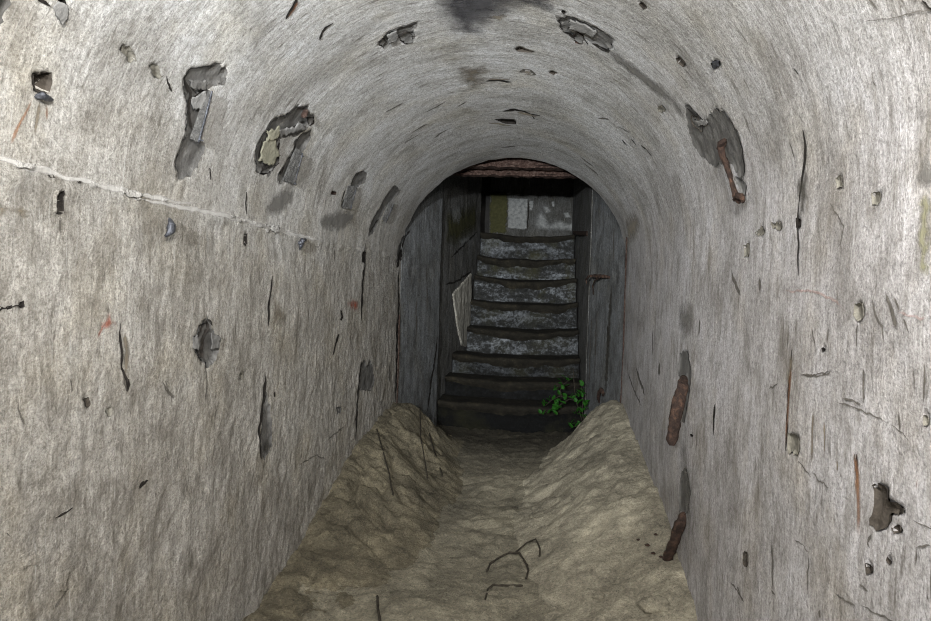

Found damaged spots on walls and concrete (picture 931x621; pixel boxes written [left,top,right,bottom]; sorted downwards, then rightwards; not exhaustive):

spalling [0,0,11,24]
spalling [378,23,417,49]
spalling [557,16,613,53]
crack [868,0,931,21]
spalling [150,63,172,92]
spalling [175,63,228,182]
spalling [255,106,314,184]
spalling [685,104,747,196]
corrosion [716,138,745,204]
corrosion [666,375,689,446]
corrosion [636,512,686,561]
spalling [867,483,905,548]